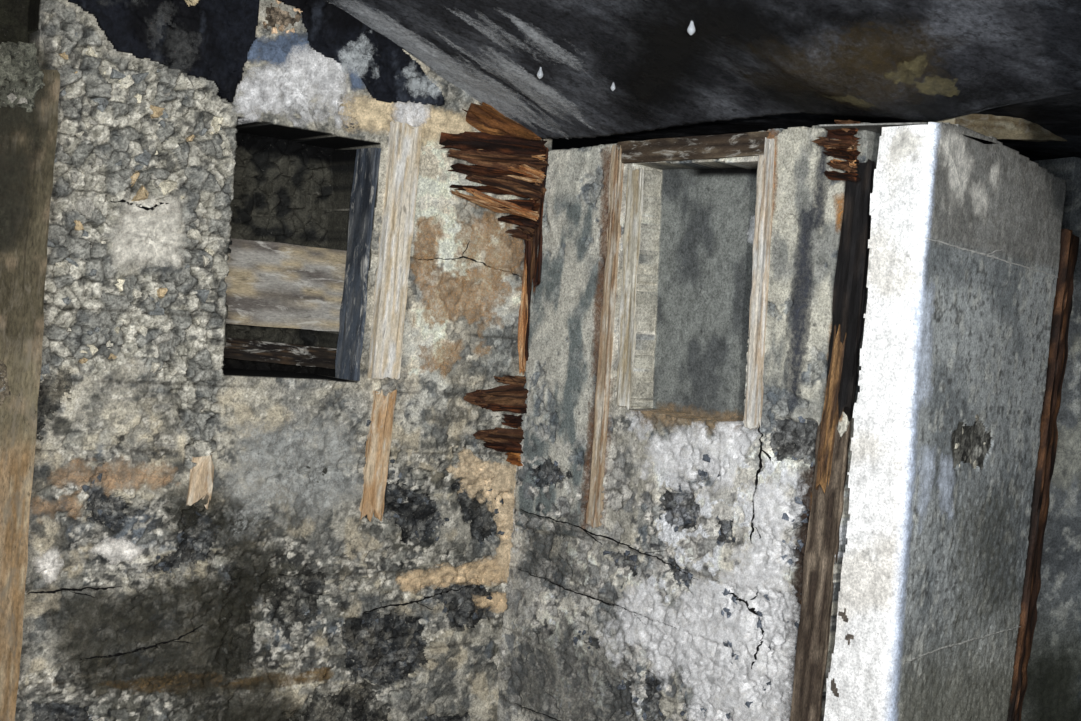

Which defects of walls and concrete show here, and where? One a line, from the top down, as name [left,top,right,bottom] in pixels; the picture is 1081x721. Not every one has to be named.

spalling [0,41,45,113]
peeling [68,0,445,201]
damp [615,0,909,114]
spalling [35,278,171,455]
crack [750,425,771,544]
damp [751,56,1049,721]
spalling [951,414,993,470]
damp [52,426,355,721]
crack [518,569,677,629]
crack [520,509,698,580]
damp [458,418,815,721]
crack [730,592,764,669]